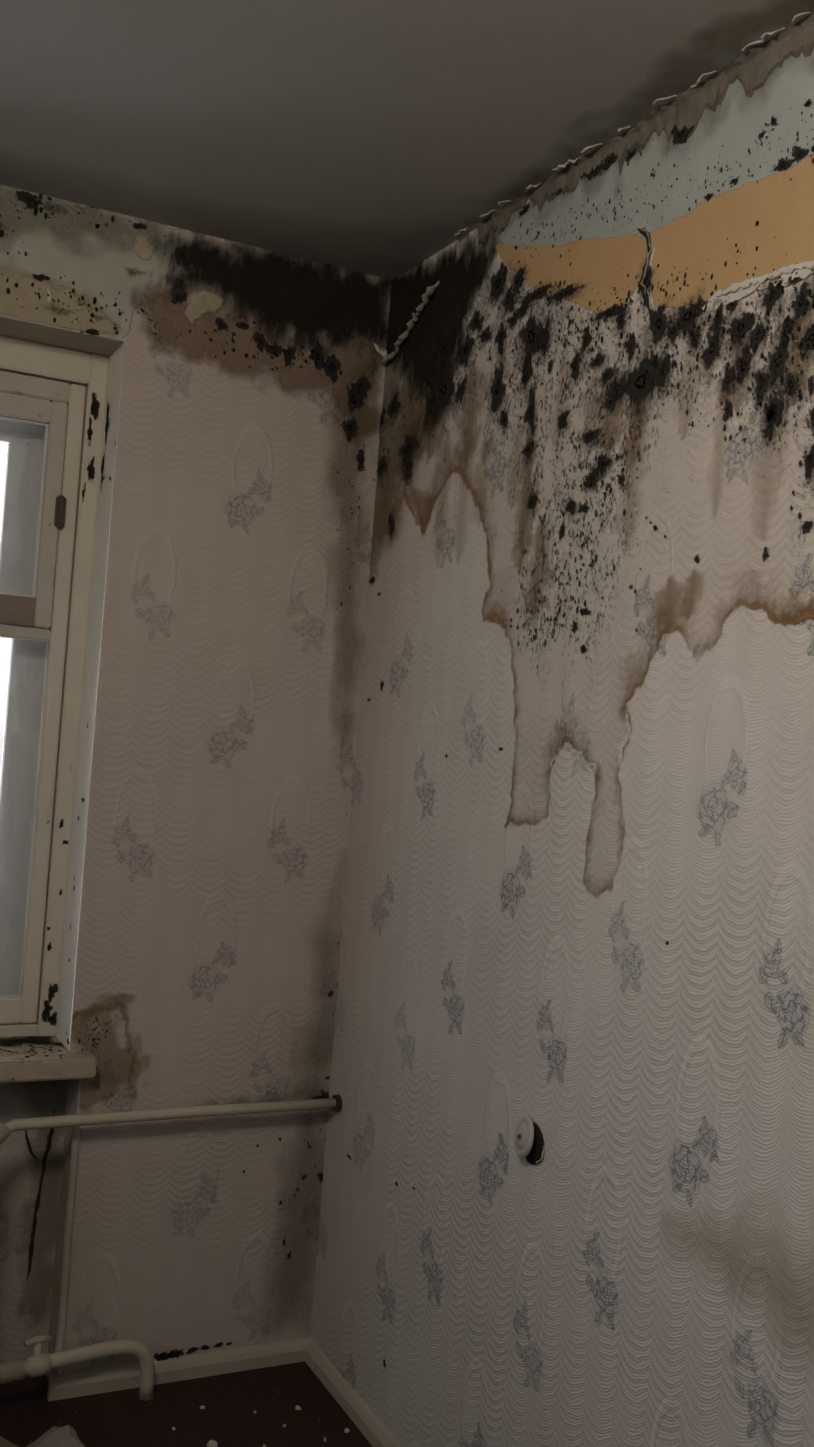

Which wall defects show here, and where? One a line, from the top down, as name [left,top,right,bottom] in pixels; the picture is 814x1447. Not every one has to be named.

water stain [0,99,814,724]
water stain [279,1076,330,1205]